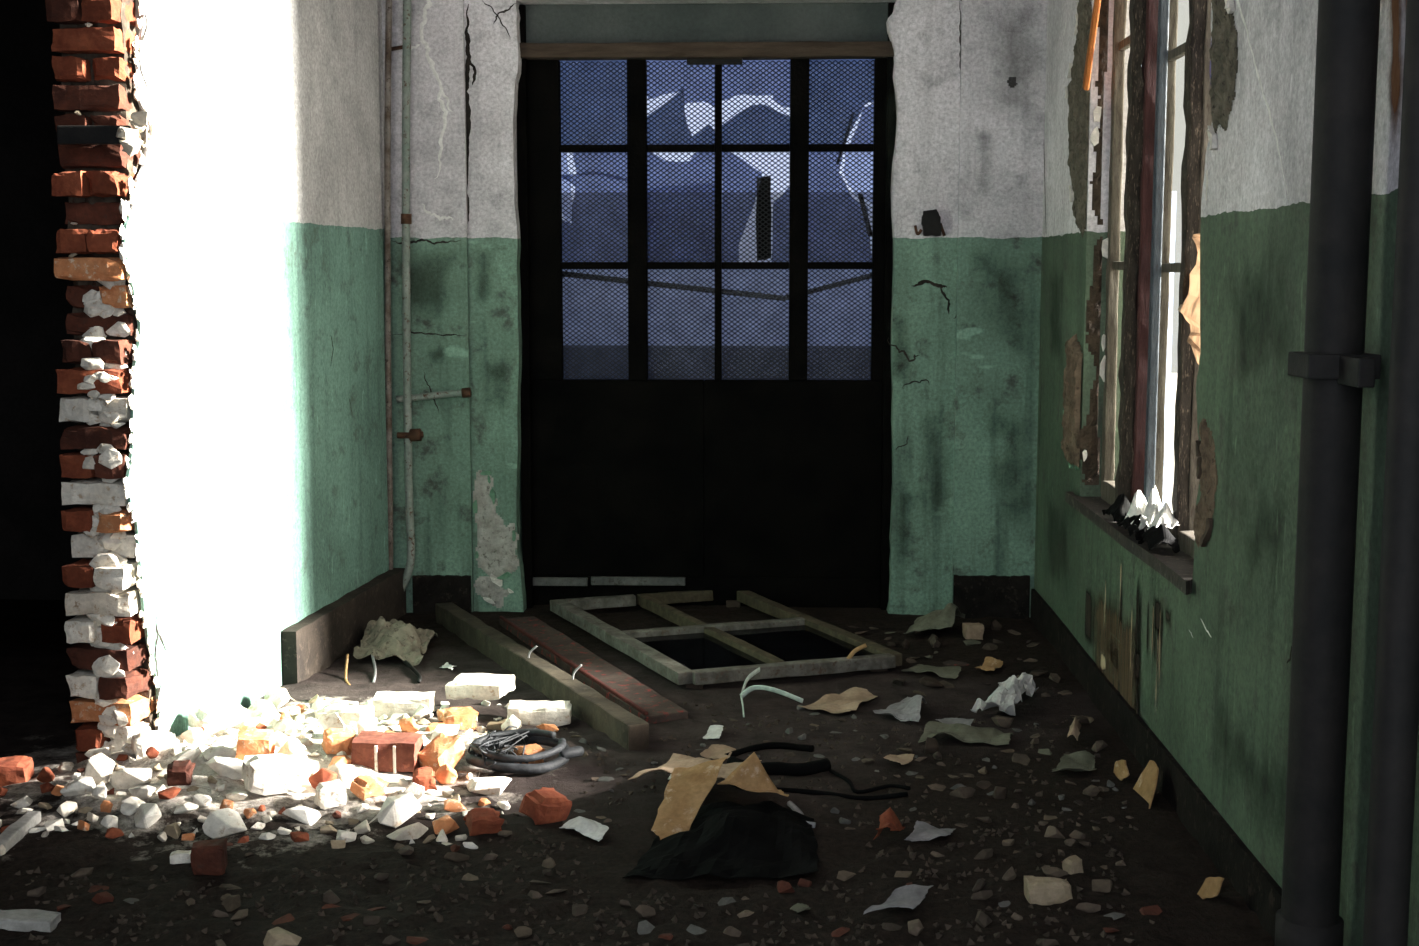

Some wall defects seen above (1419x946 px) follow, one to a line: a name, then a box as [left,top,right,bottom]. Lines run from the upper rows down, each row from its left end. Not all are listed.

crack [391,3,516,245]
flaking render [1207,0,1238,150]
flaking render [1065,0,1109,485]
crack [394,317,470,336]
peeling [472,470,519,608]
flaking render [1193,418,1218,547]